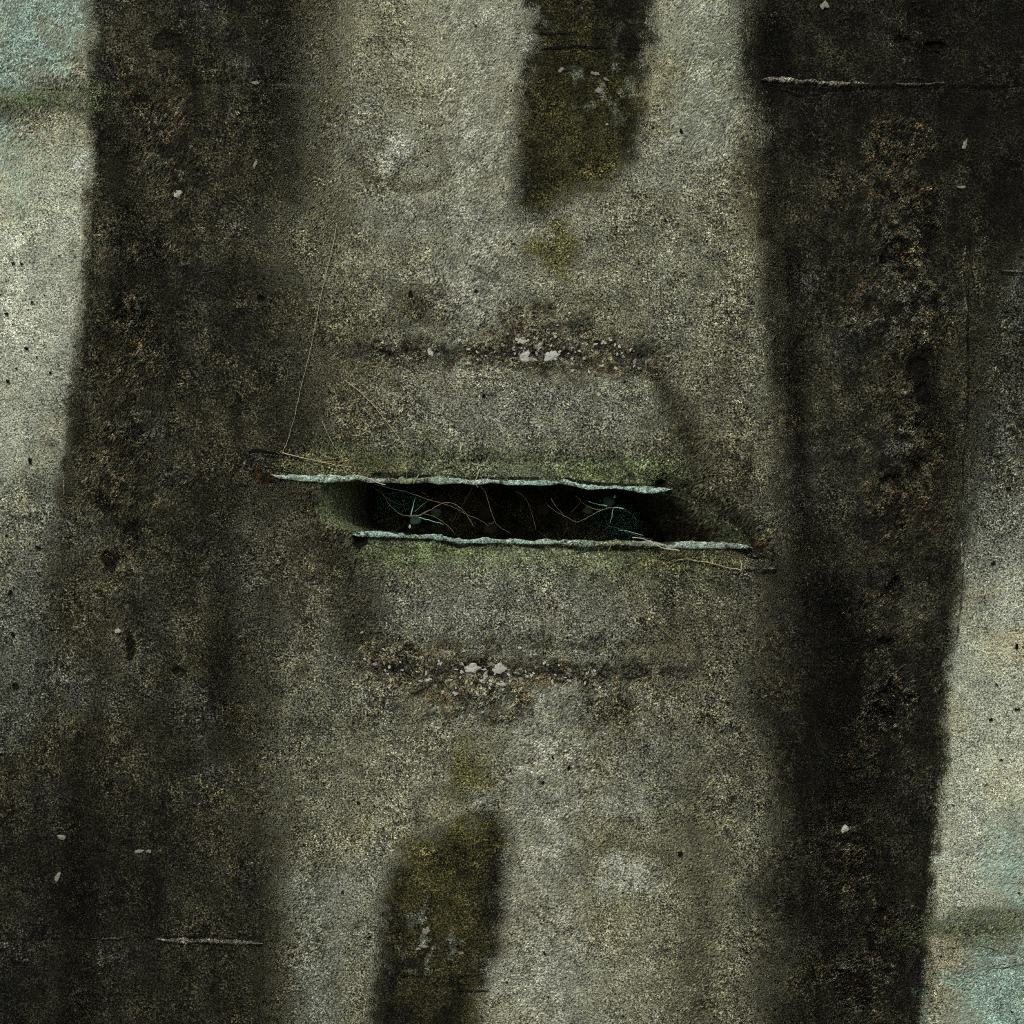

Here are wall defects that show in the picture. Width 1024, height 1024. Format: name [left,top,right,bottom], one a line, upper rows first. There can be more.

water stain [650,366,712,476]
crack [362,472,539,480]
crack [565,477,672,487]
water stain [0,0,553,1024]
water stain [660,0,1024,1024]
crack [352,537,662,552]
crack [743,548,777,574]